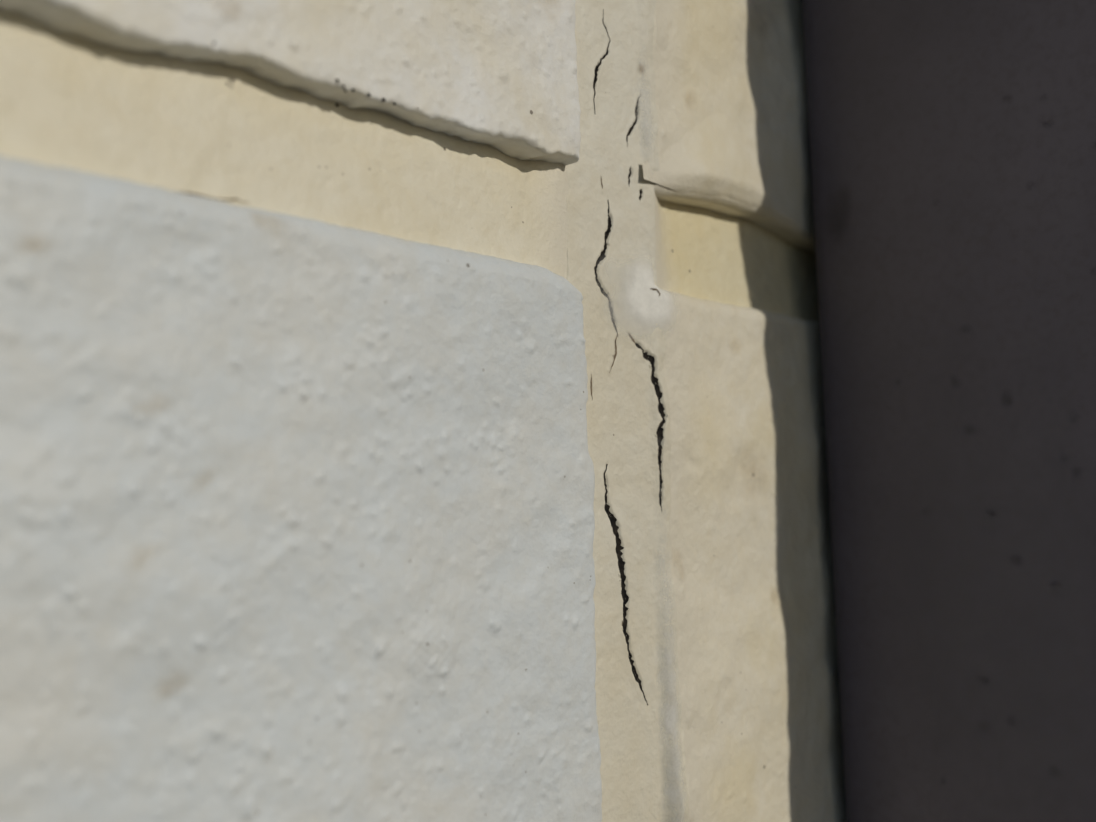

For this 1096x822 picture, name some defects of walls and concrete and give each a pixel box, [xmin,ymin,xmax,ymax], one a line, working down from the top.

crack [593,9,610,110]
crack [590,95,668,512]
crack [604,464,648,705]